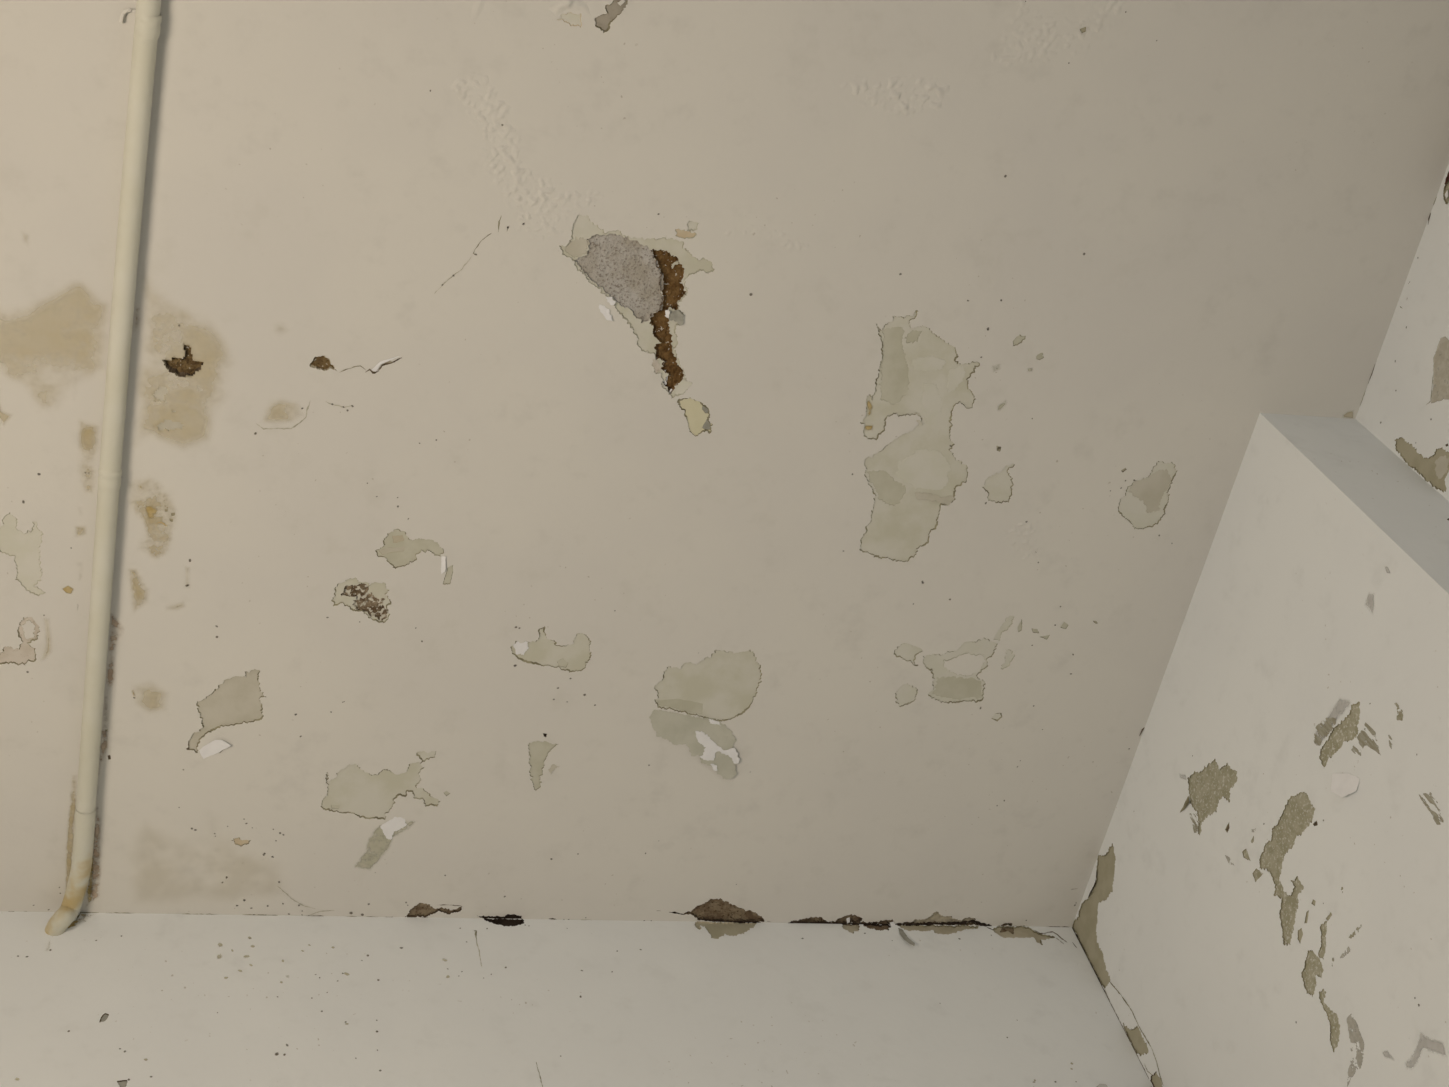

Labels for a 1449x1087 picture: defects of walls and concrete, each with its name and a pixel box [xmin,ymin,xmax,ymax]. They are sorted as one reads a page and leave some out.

flaking render [559,215,715,437]
water stain [149,326,220,441]
peeling [859,310,1015,562]
flaking render [331,577,392,623]
peeling [186,669,266,759]
peeling [1314,700,1392,767]
peeling [1180,759,1237,835]
flaking render [405,903,462,918]
flaking render [479,914,524,926]
flaking render [670,898,769,939]
peeling [842,843,1163,1087]
peeling [1225,792,1362,1052]